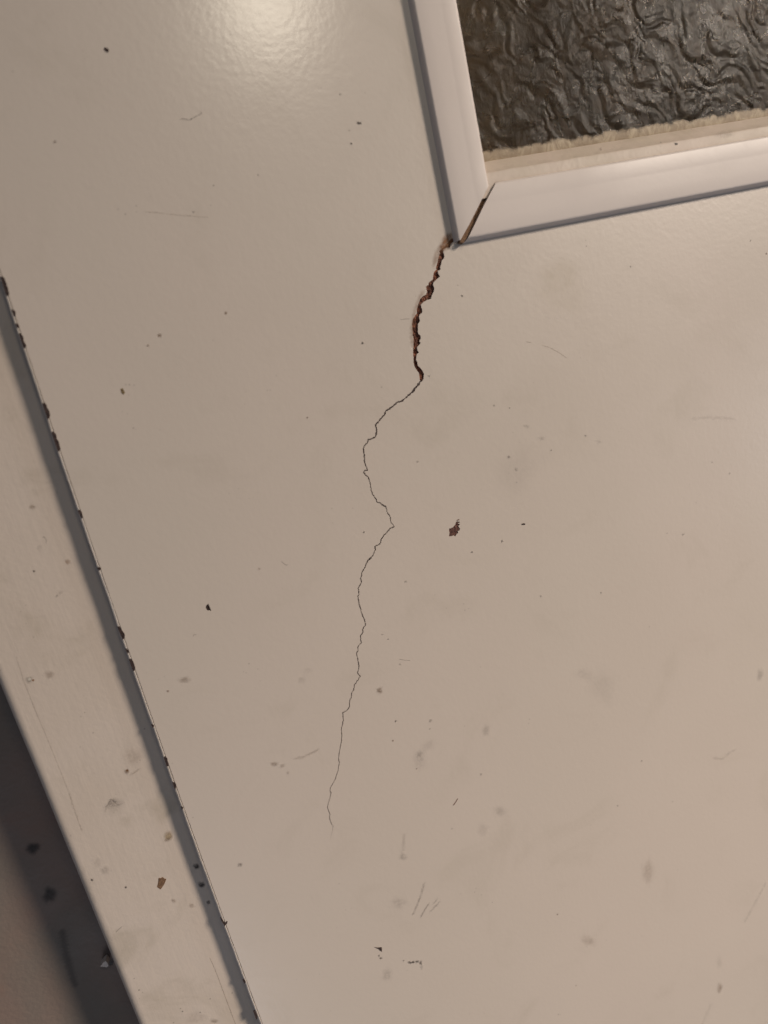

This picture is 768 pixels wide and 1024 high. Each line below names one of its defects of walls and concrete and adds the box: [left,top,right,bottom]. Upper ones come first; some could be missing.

crack [327,239,453,825]